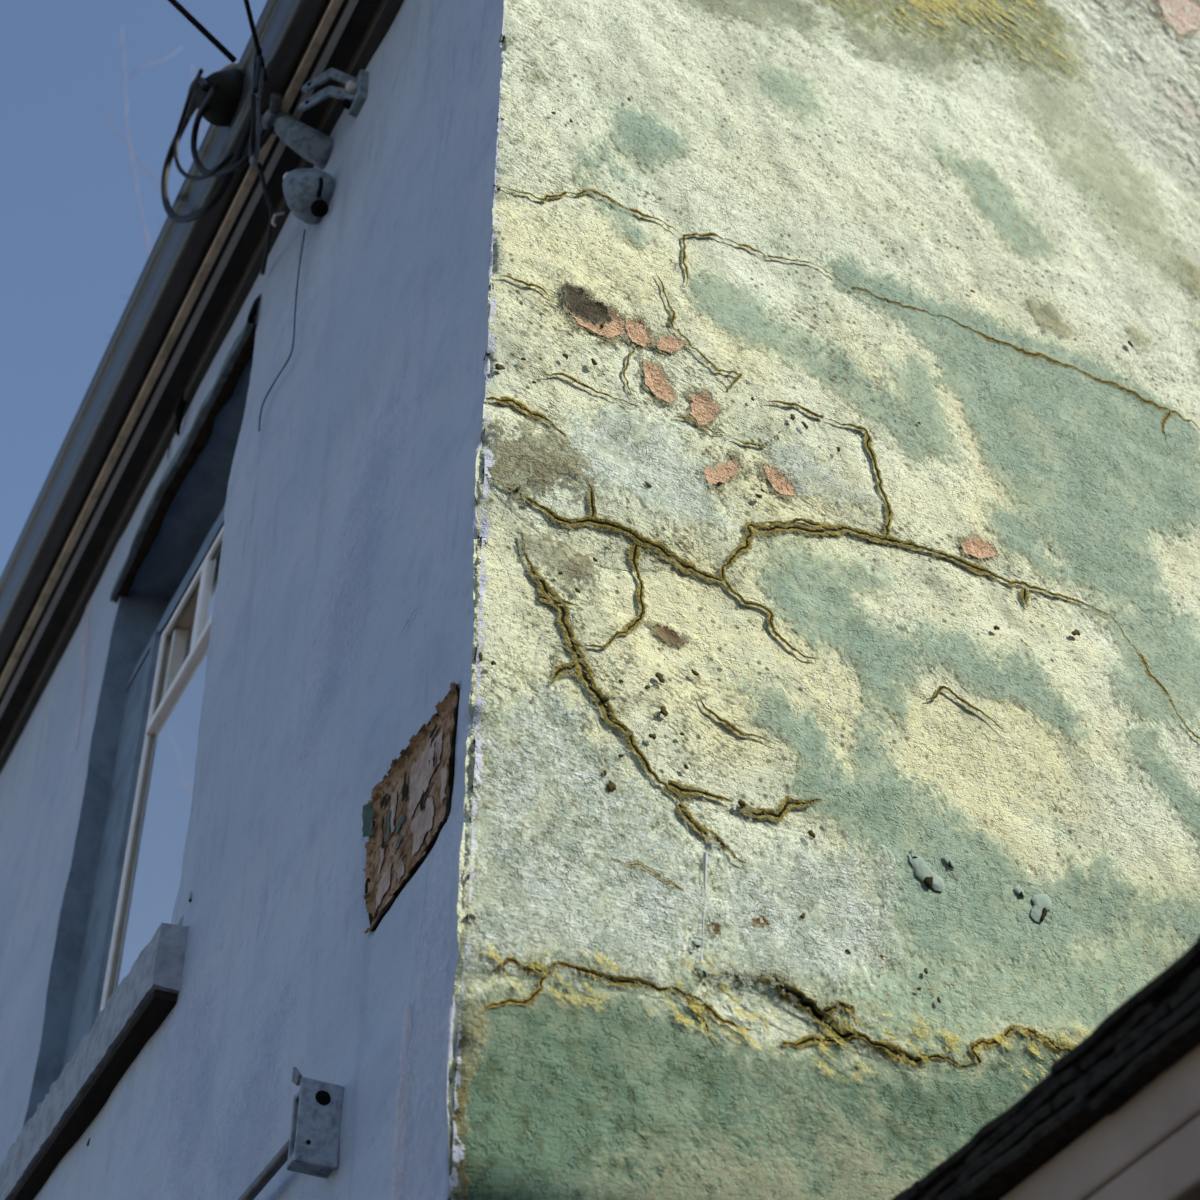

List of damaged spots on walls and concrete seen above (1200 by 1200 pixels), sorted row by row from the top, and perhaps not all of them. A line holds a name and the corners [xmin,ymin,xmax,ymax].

leakage [745,47,828,121]
leakage [691,0,971,92]
peeling [1067,0,1200,211]
leakage [931,144,1058,263]
spalling [554,268,727,434]
crack [500,186,1200,439]
spalling [696,447,804,502]
crack [485,396,1200,864]
leakage [449,248,1200,1200]
flaking render [362,682,460,934]
crack [472,956,1070,1069]